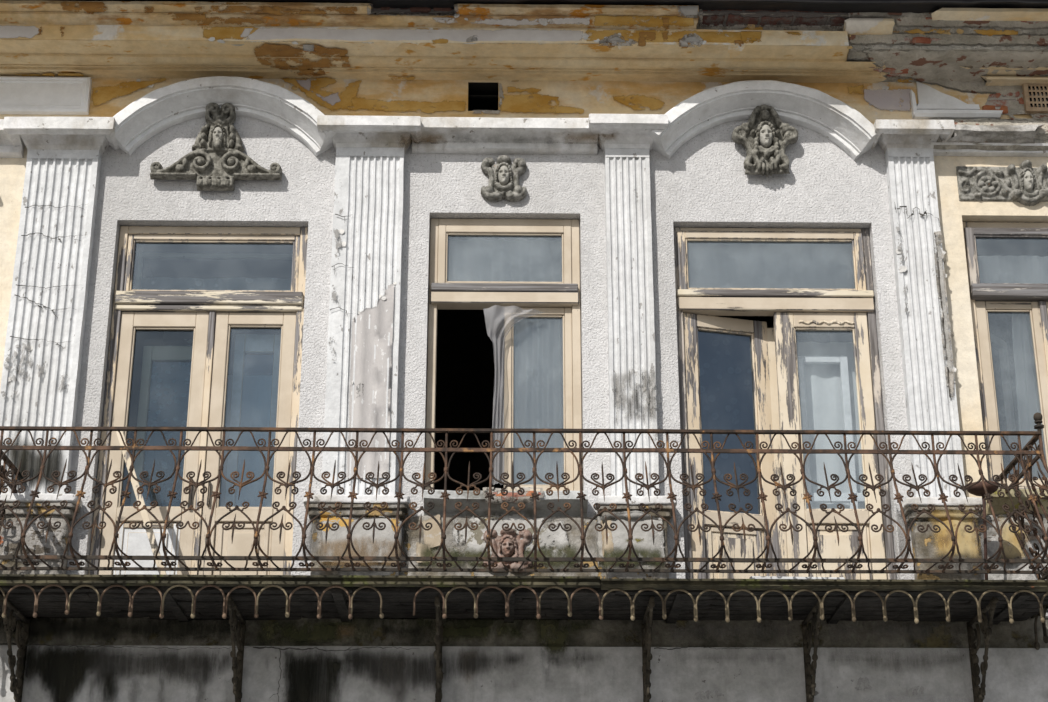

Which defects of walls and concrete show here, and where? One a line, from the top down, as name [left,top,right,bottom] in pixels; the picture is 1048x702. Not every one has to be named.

peeling [0,25,42,38]
peeling [92,78,169,106]
flaking render [202,4,1048,136]
peeling [333,229,346,254]
peeling [346,282,397,478]
water stain [13,618,241,702]
water stain [259,622,490,702]